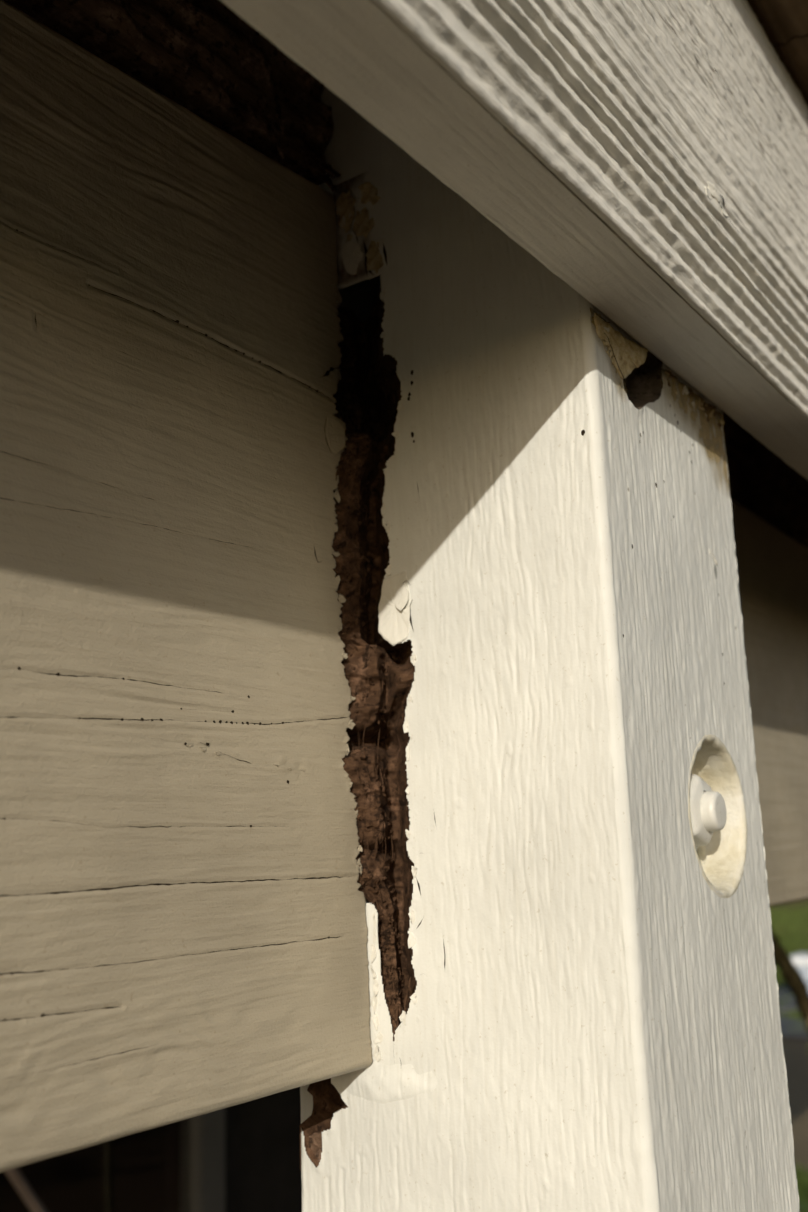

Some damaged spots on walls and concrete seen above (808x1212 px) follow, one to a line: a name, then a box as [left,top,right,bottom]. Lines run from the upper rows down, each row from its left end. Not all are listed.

spalling [594,312,725,428]